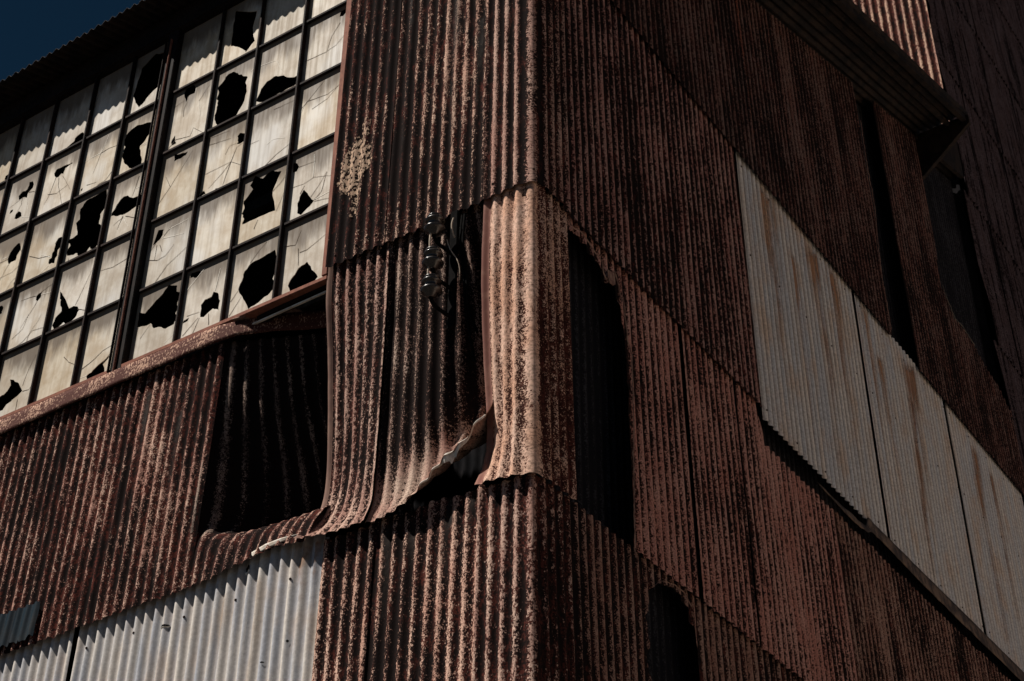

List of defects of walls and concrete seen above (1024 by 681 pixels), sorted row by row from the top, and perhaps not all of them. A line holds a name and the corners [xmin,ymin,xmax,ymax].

peeling [337,117,372,217]
corrosion [806,253,843,365]
corrosion [905,367,918,439]
corrosion [973,450,1000,516]